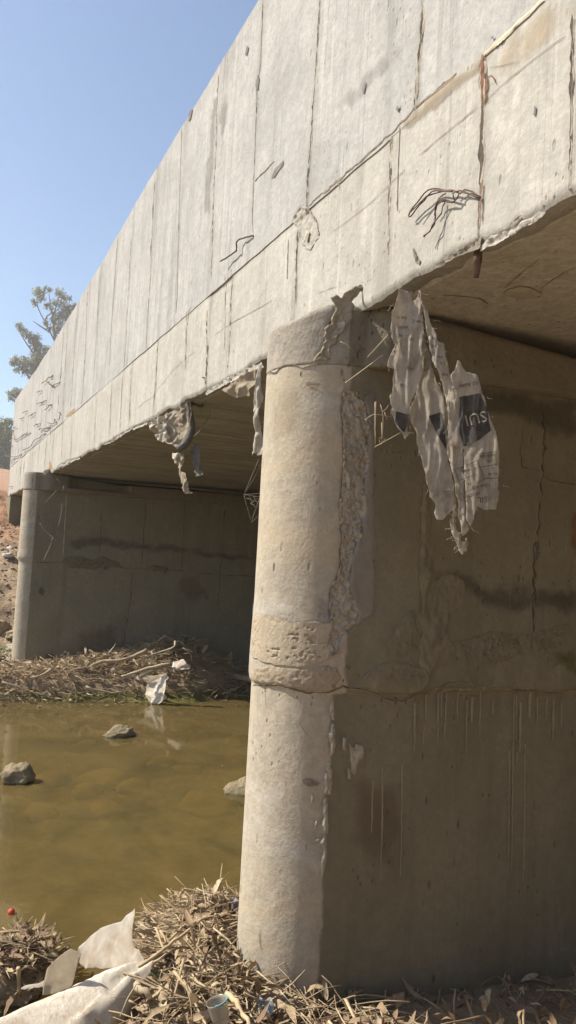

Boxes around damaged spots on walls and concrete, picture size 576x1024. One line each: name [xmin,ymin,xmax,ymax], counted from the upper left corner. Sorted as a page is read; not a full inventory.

spalling [36,456,81,477]
crack [12,73,267,485]
spalling [205,363,264,395]
crack [252,2,274,233]
spalling [292,206,319,250]
spalling [313,285,363,362]
peeling [304,390,377,662]
crack [287,0,576,304]
rust [478,55,488,103]
crack [530,397,547,633]
peeling [302,700,365,883]